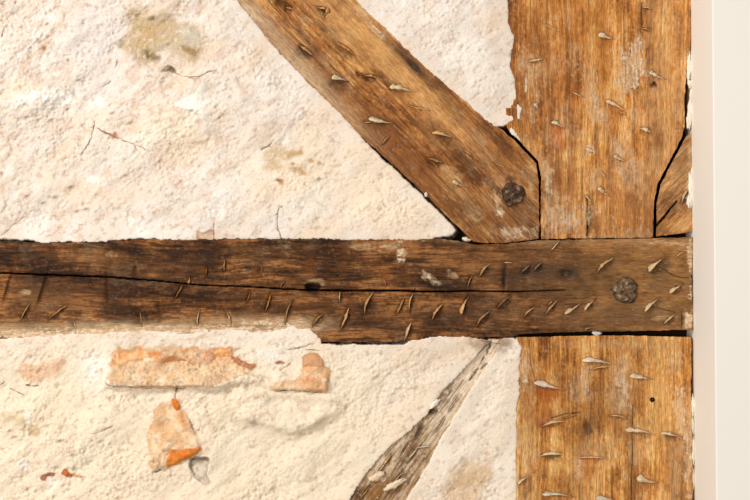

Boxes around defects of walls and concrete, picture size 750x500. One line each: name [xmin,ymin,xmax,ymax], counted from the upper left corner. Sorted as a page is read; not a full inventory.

water stain [118,9,205,61]
crack [0,272,553,292]
spalling [109,345,256,389]
spalling [269,353,331,393]
spalling [148,399,209,484]